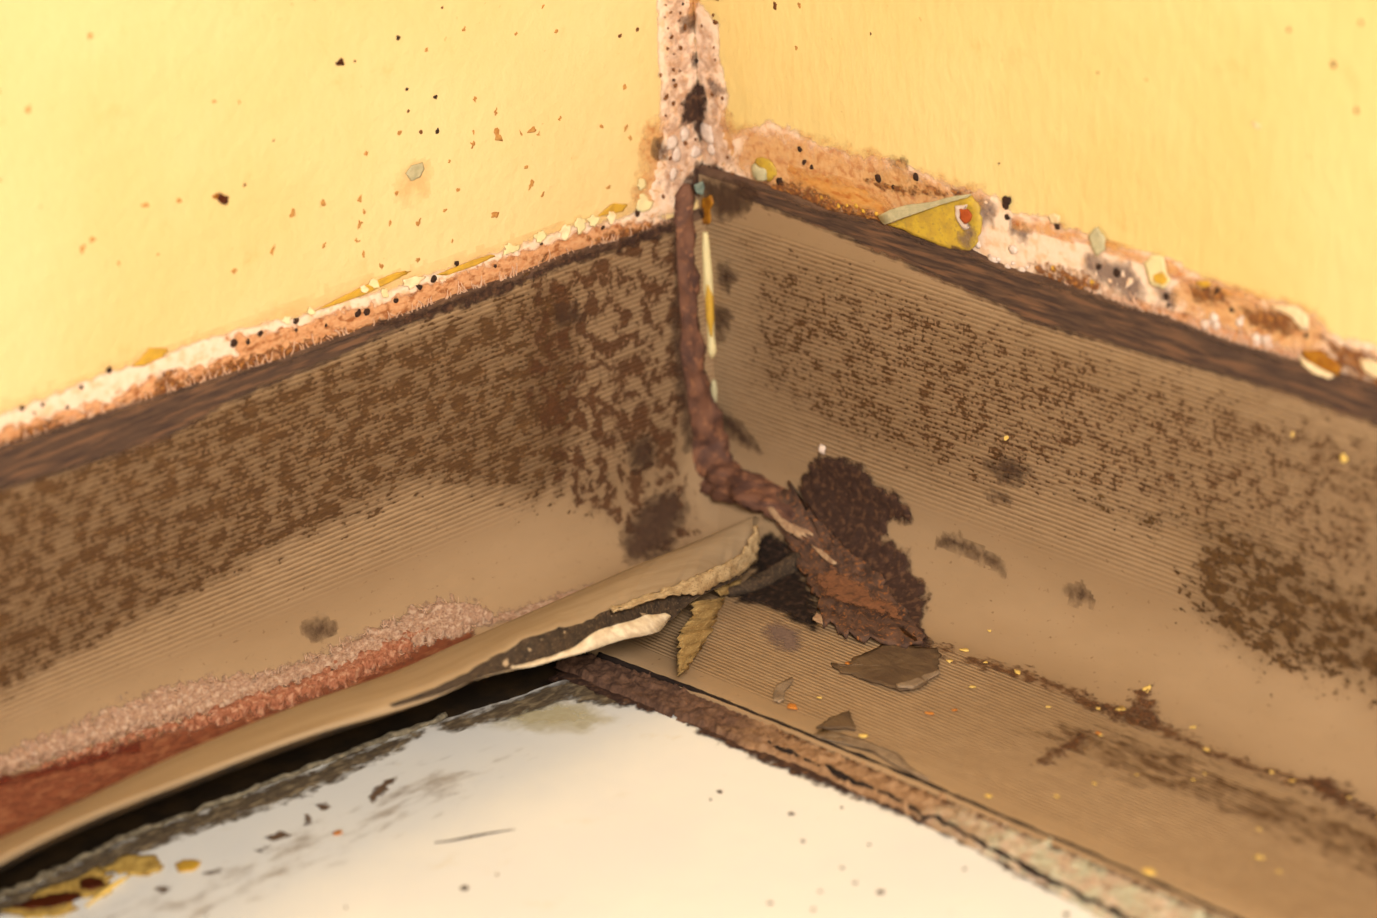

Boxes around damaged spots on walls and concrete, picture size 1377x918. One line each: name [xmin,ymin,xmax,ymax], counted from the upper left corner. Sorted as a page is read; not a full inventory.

peeling [0,0,1377,445]
damp [0,585,590,775]
damp [0,224,701,702]
rust [813,569,902,619]
damp [686,723,1058,894]
damp [704,181,1377,710]